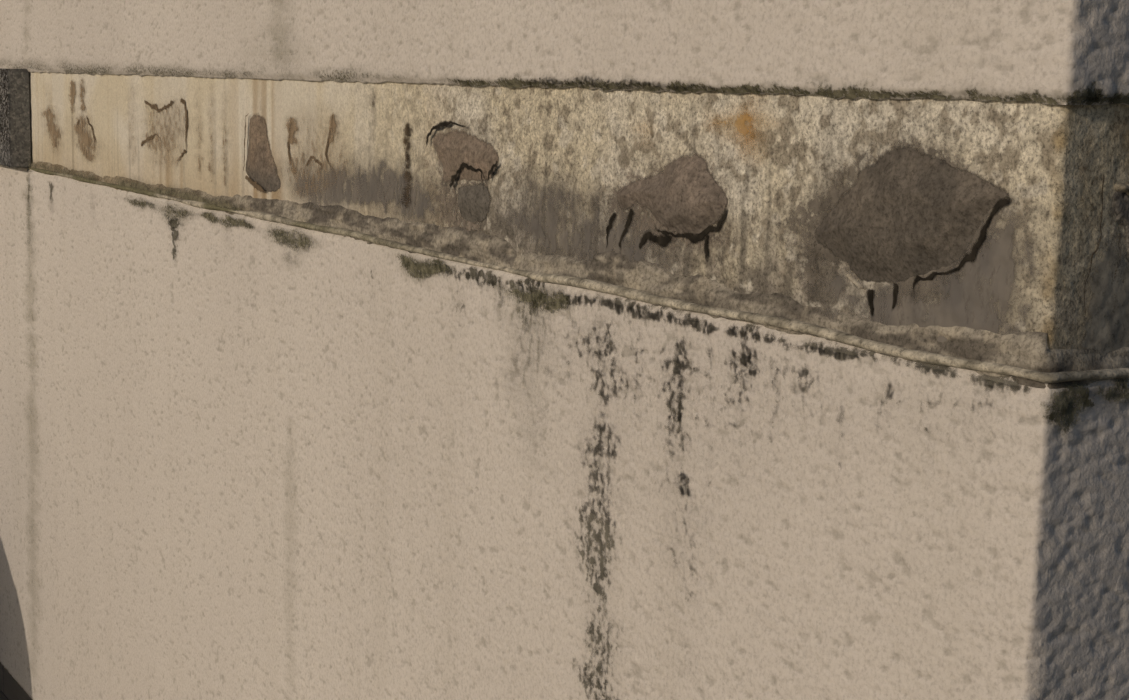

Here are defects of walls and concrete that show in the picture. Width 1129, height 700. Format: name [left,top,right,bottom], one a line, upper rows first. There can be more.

damp [43,109,60,147]
damp [70,80,95,161]
damp [295,123,435,220]
damp [168,217,180,259]
damp [507,182,666,267]
damp [797,210,1032,342]
damp [1080,240,1129,356]
damp [971,374,1029,404]
damp [434,264,956,700]